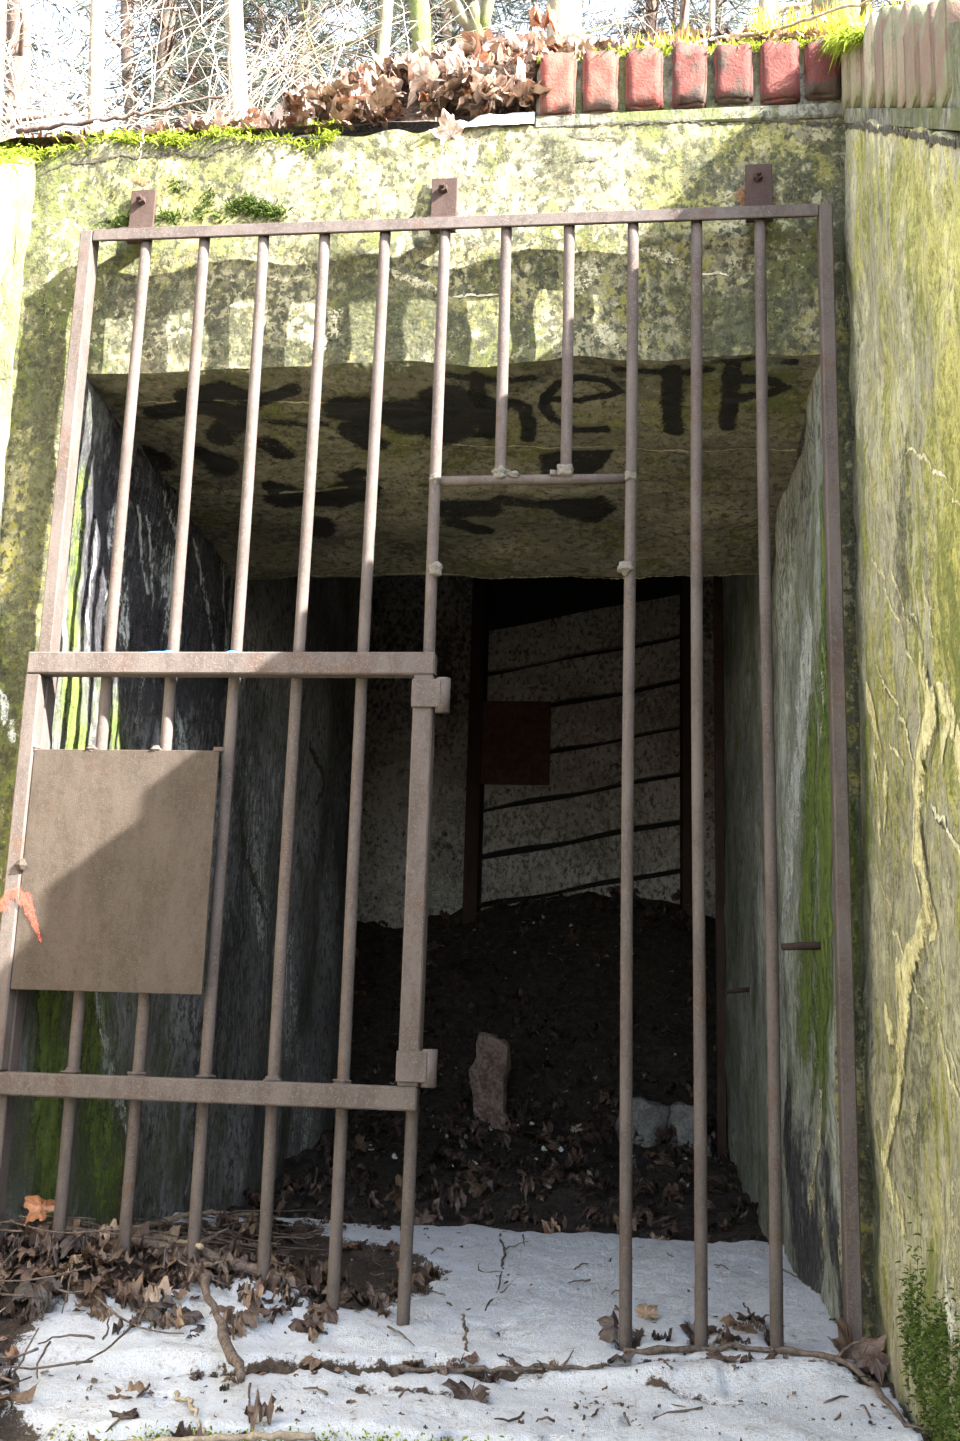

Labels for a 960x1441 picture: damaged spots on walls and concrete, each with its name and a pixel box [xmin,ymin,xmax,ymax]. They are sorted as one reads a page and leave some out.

damp [130,265,213,327]
damp [287,237,358,266]
damp [184,279,473,371]
damp [682,306,801,369]
damp [833,127,850,387]
damp [782,484,834,1121]
damp [846,413,873,1272]
damp [32,990,121,1075]
damp [23,1096,127,1228]